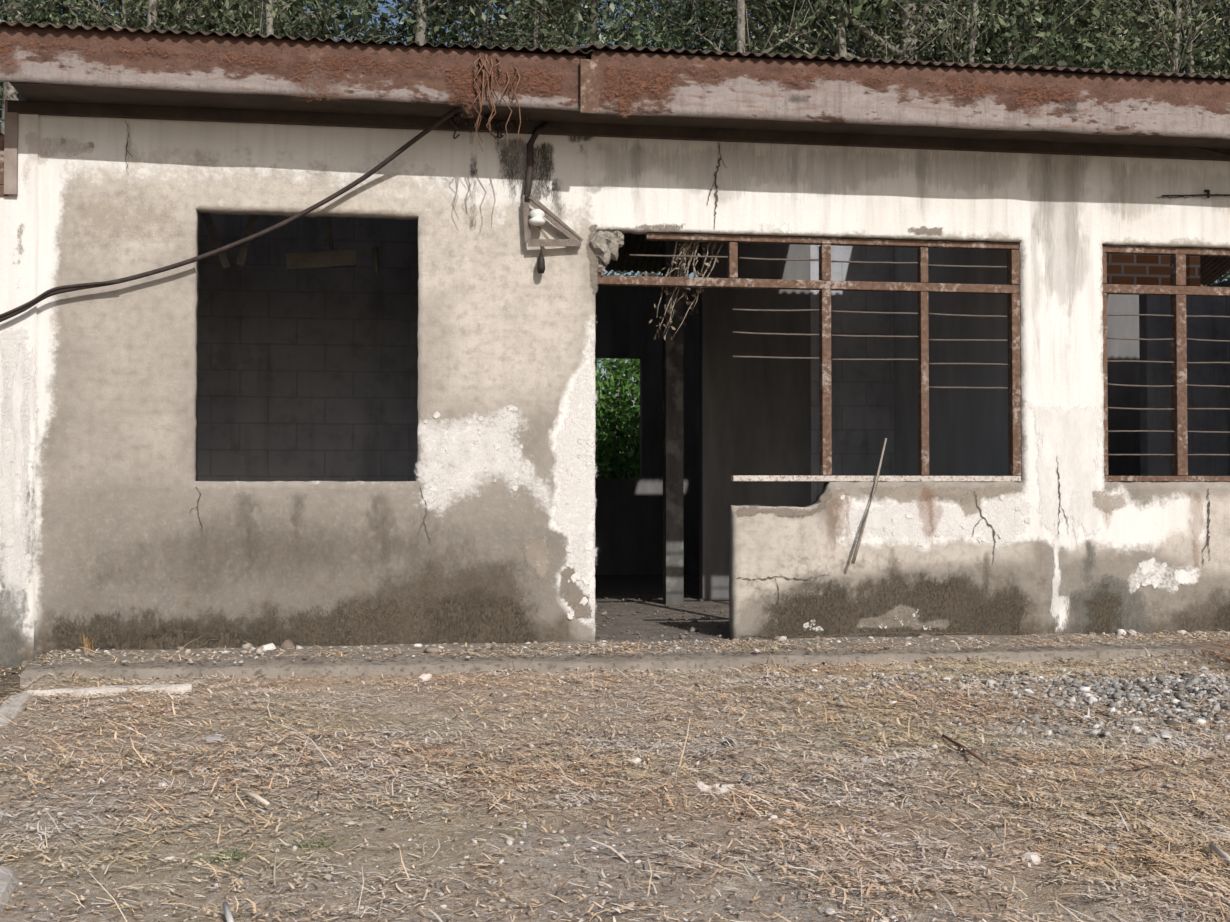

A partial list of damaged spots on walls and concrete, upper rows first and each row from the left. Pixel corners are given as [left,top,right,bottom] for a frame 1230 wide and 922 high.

corrosion [445,66,564,110]
damp [539,144,561,211]
crack [707,142,725,229]
flaking render [586,224,685,294]
flaking render [761,223,792,233]
peeling [417,350,597,626]
crack [973,491,1001,565]
damp [1050,520,1069,630]
damp [1084,541,1095,572]
peeling [1129,558,1200,593]
crack [1202,489,1210,568]
damp [52,598,402,651]